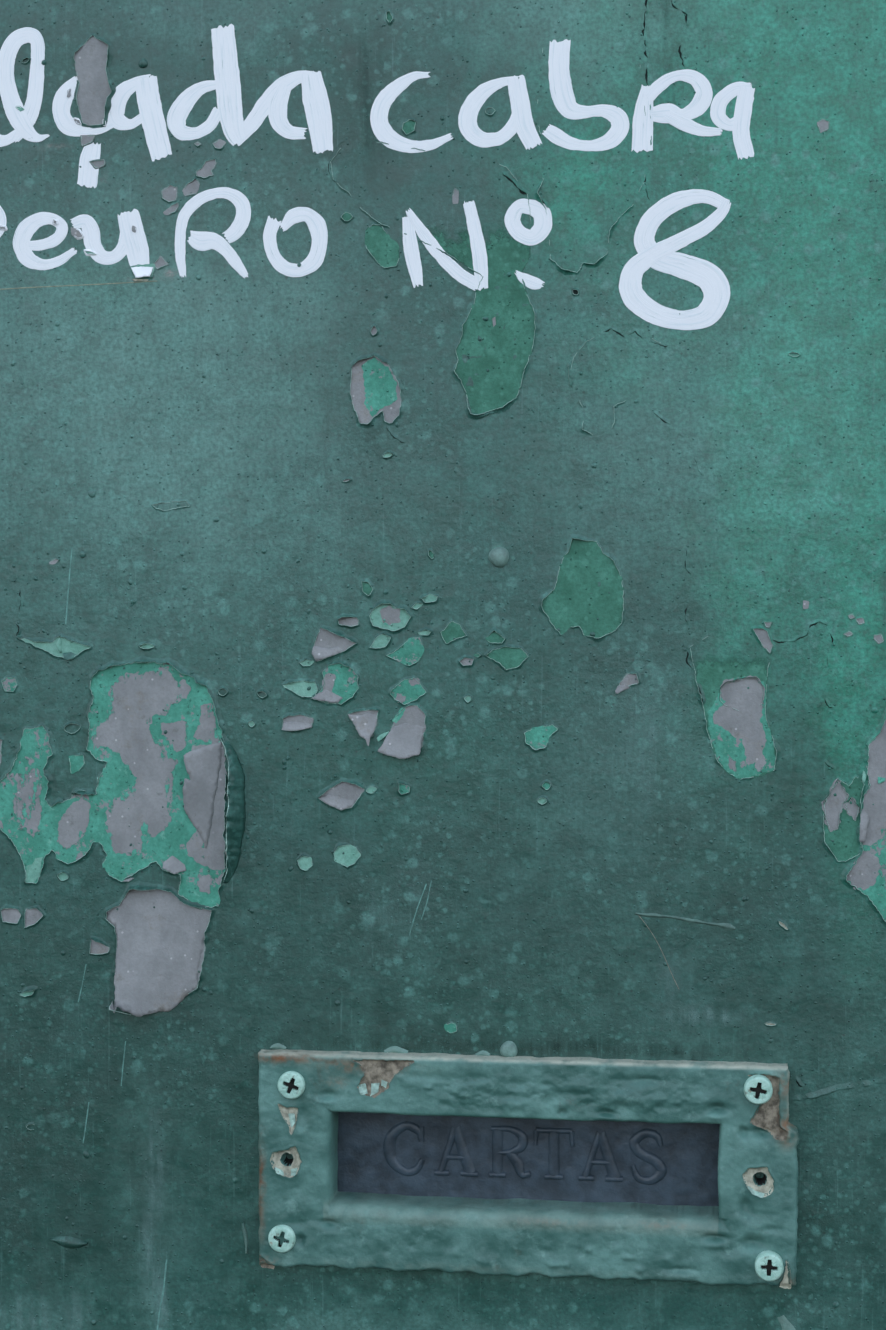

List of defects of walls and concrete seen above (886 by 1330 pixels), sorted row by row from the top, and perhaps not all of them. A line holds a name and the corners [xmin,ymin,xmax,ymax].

peeling [67,33,116,169]
peeling [527,21,647,275]
peeling [329,147,540,428]
peeling [15,633,94,661]
peeling [280,599,429,759]
peeling [538,534,626,643]
peeling [687,621,781,781]
peeling [0,656,246,1017]
peeling [296,852,314,872]
peeling [315,778,366,813]
peeling [332,842,363,870]
peeling [820,707,886,928]